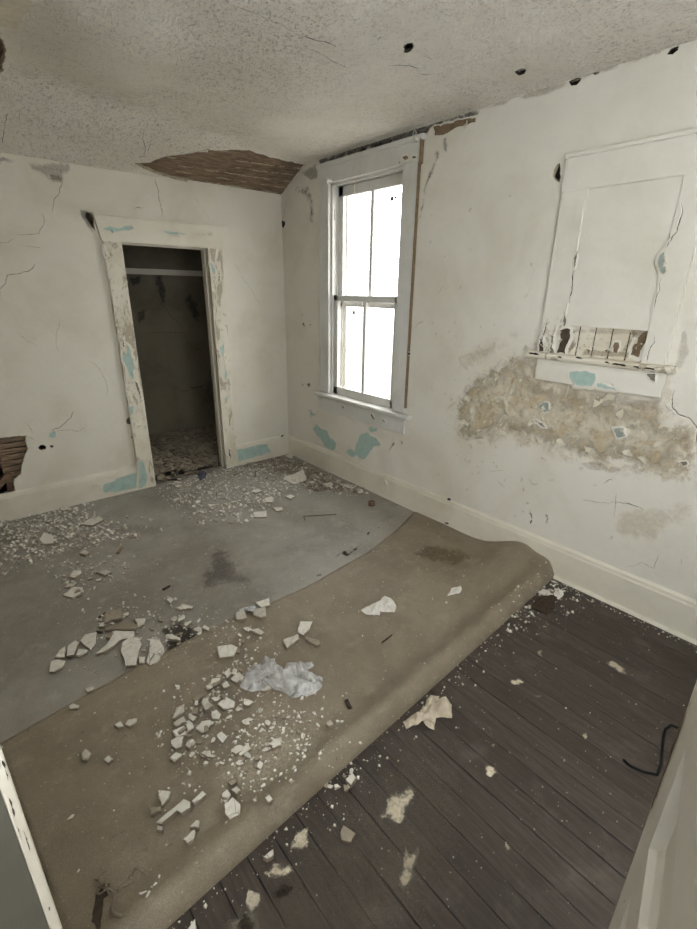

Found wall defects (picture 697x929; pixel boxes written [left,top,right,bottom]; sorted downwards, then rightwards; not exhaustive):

flaking render [432,115,479,140]
crack [663,203,683,248]
crack [650,277,661,312]
peeling [529,313,658,393]
crack [644,335,655,363]
peeling [217,319,273,463]
peeling [312,413,404,463]
flaking render [0,435,28,494]
peeling [100,459,150,495]